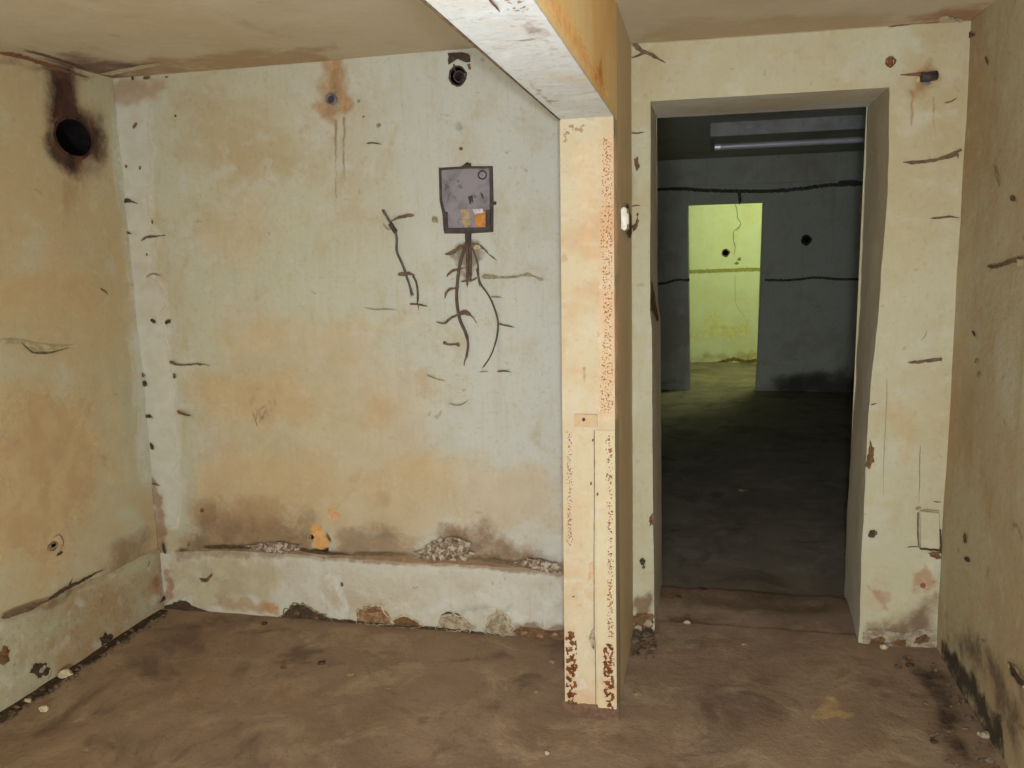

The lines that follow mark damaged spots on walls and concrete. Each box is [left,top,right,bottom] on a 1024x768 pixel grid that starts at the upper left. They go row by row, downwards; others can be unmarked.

corrosion [319,59,352,117]
crack [382,209,414,230]
corrosion [600,138,613,413]
crack [364,243,543,373]
damp [187,504,309,555]
damp [424,527,546,572]
crack [1,569,104,619]
spalling [356,603,564,641]
spalling [0,646,10,666]
spalling [30,663,51,679]
corrosion [565,631,578,705]
damp [915,640,1018,759]